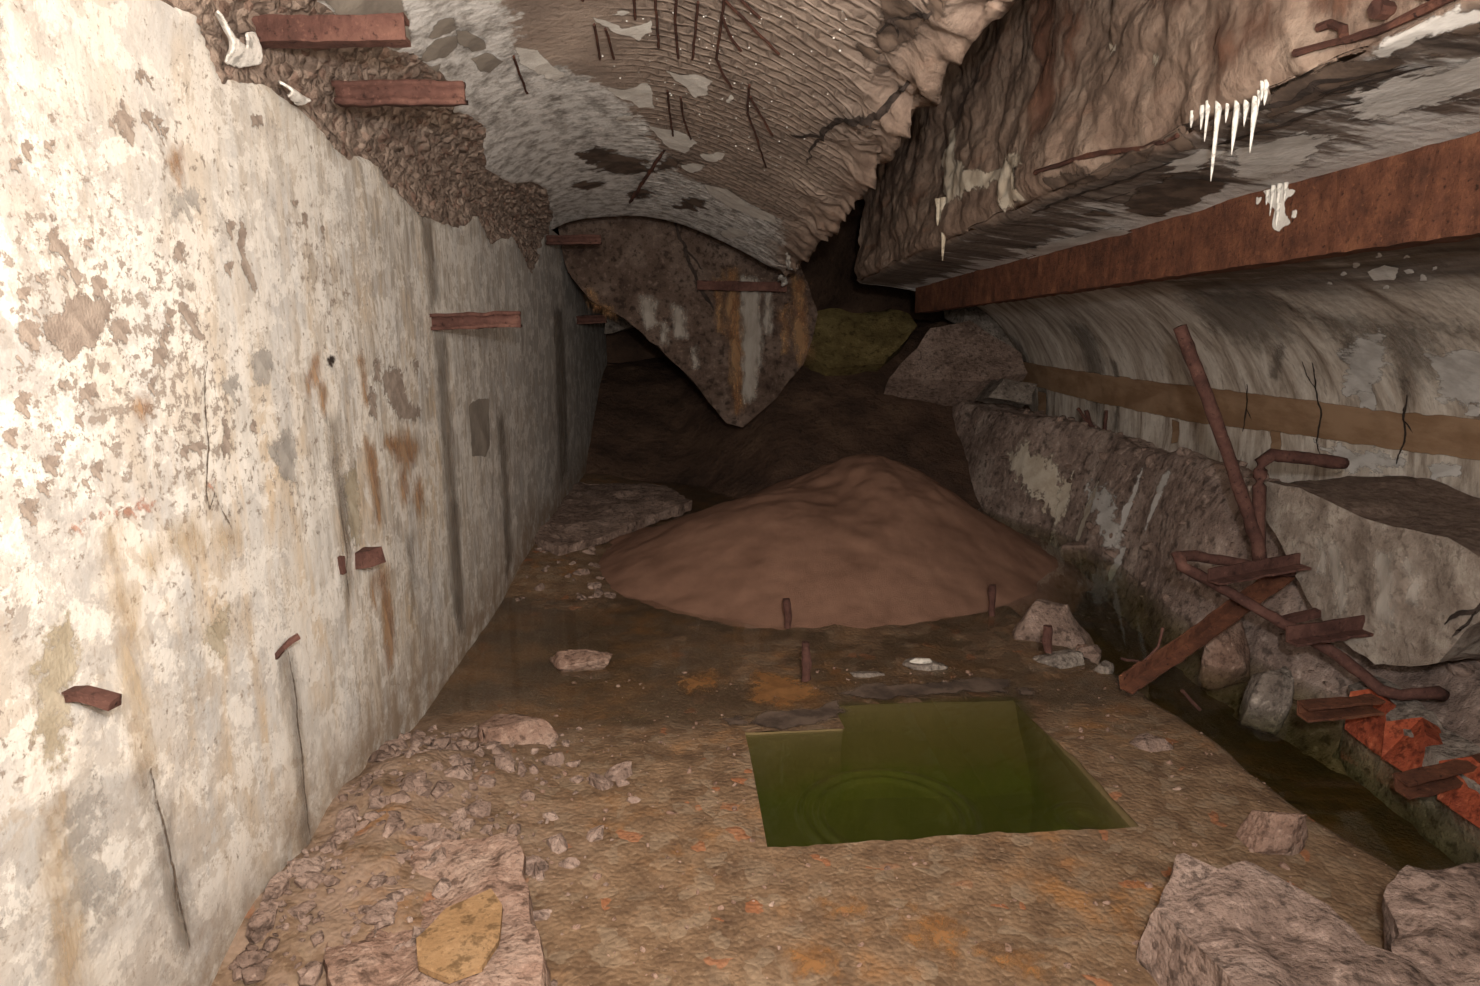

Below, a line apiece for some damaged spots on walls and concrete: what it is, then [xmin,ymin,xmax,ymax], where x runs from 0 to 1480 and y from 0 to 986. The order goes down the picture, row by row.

peeling [109,68,169,147]
spalling [160,0,553,273]
leakage [515,47,565,81]
leakage [594,11,652,41]
crack [790,80,910,163]
spalling [1033,117,1227,217]
leakage [1164,120,1338,231]
spalling [1255,0,1456,129]
crack [1302,362,1322,454]
crack [1396,395,1412,464]
leakage [438,342,463,623]
corrosion [372,570,393,661]